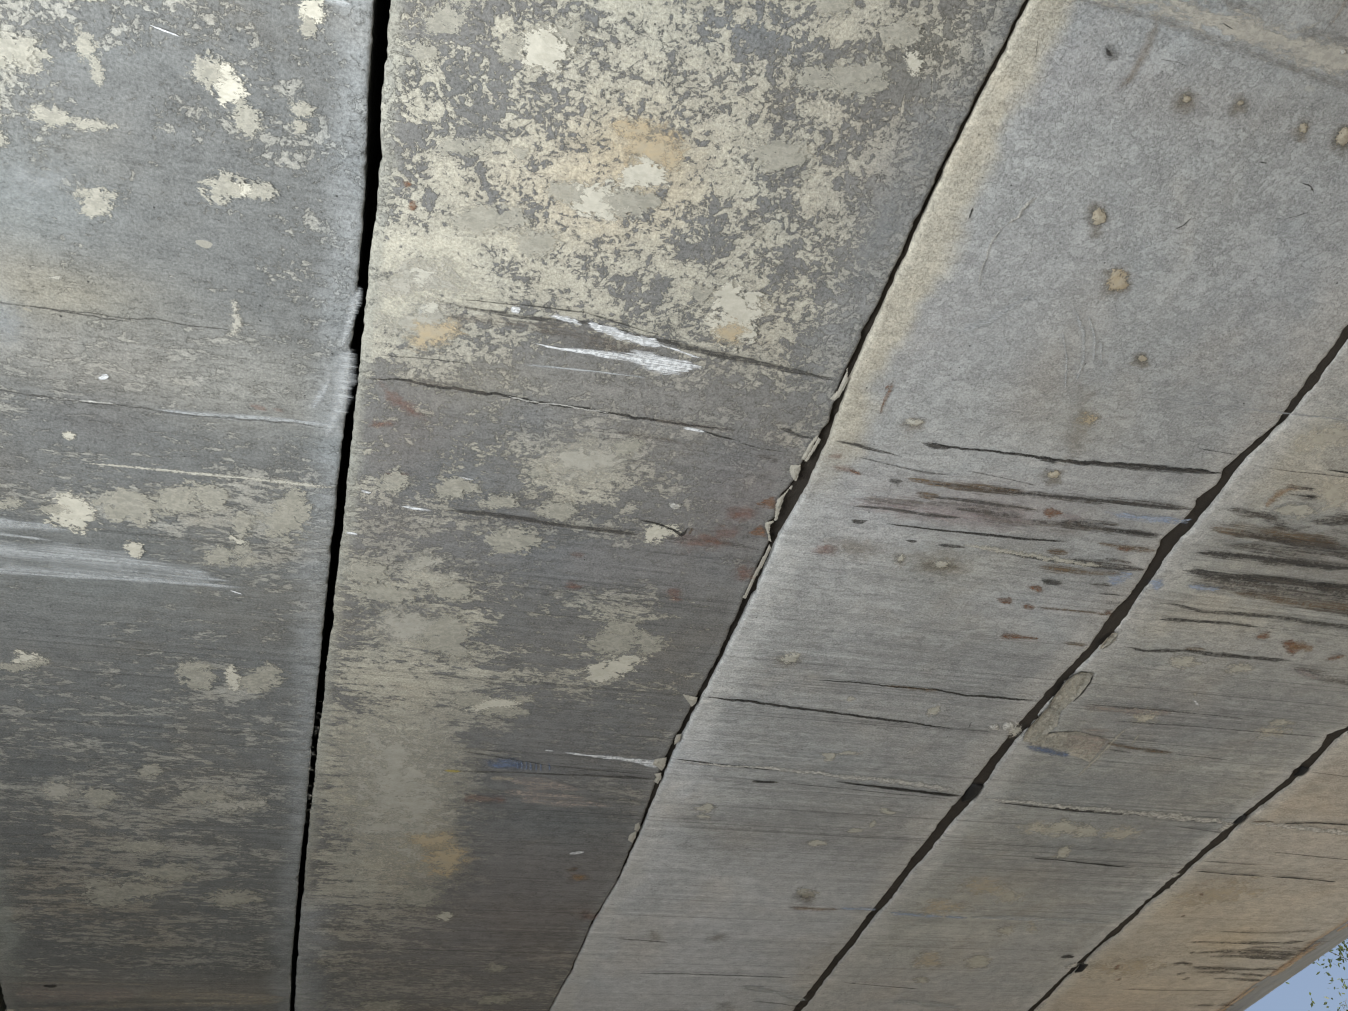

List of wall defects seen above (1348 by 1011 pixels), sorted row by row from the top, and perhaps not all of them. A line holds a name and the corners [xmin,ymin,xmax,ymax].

crack [1,302,227,330]
leakage [459,300,830,380]
crack [369,355,730,430]
crack [922,443,1231,474]
peeling [640,502,691,544]
spalling [742,436,821,599]
spalling [969,671,1106,762]
spalling [652,734,681,784]